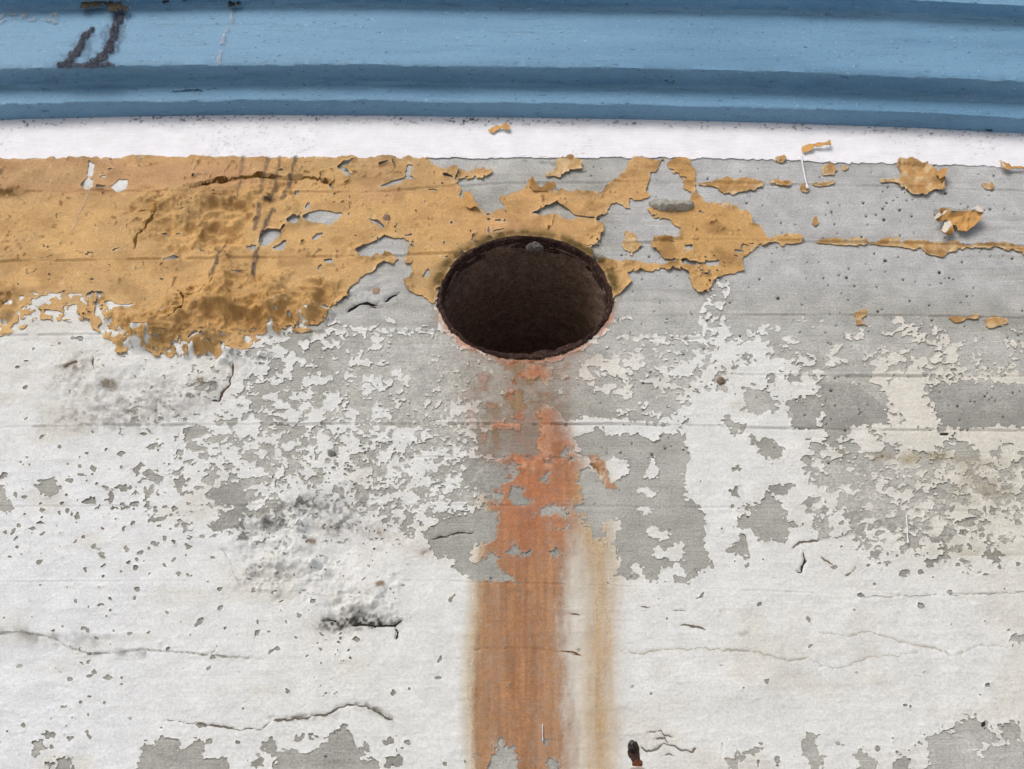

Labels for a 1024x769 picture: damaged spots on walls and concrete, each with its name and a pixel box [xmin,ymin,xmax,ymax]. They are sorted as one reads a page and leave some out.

crack [201,171,328,186]
peeling [0,154,1024,669]
corrosion [591,455,616,488]
corrosion [474,343,589,769]
crack [0,631,249,659]
water stain [323,615,392,630]
corrosion [587,528,610,769]
peeling [31,696,106,769]
peeling [137,722,229,769]
crack [169,704,393,730]
peeling [251,724,411,769]
peeling [892,715,1024,769]